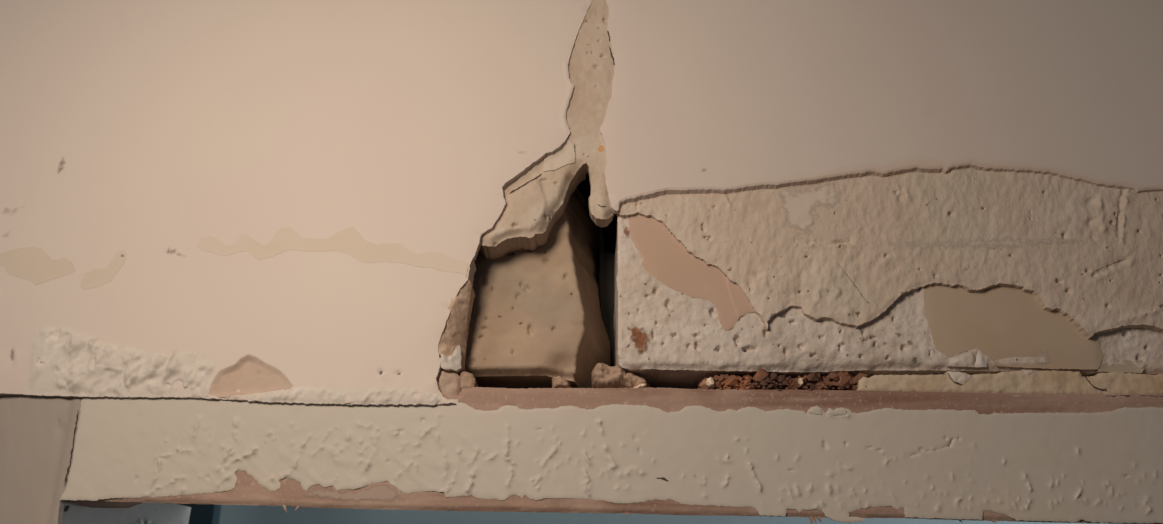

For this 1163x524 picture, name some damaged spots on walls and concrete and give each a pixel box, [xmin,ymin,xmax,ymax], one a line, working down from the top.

flaking render [197,0,1163,415]
peeling [99,470,759,517]
peeling [849,506,905,518]